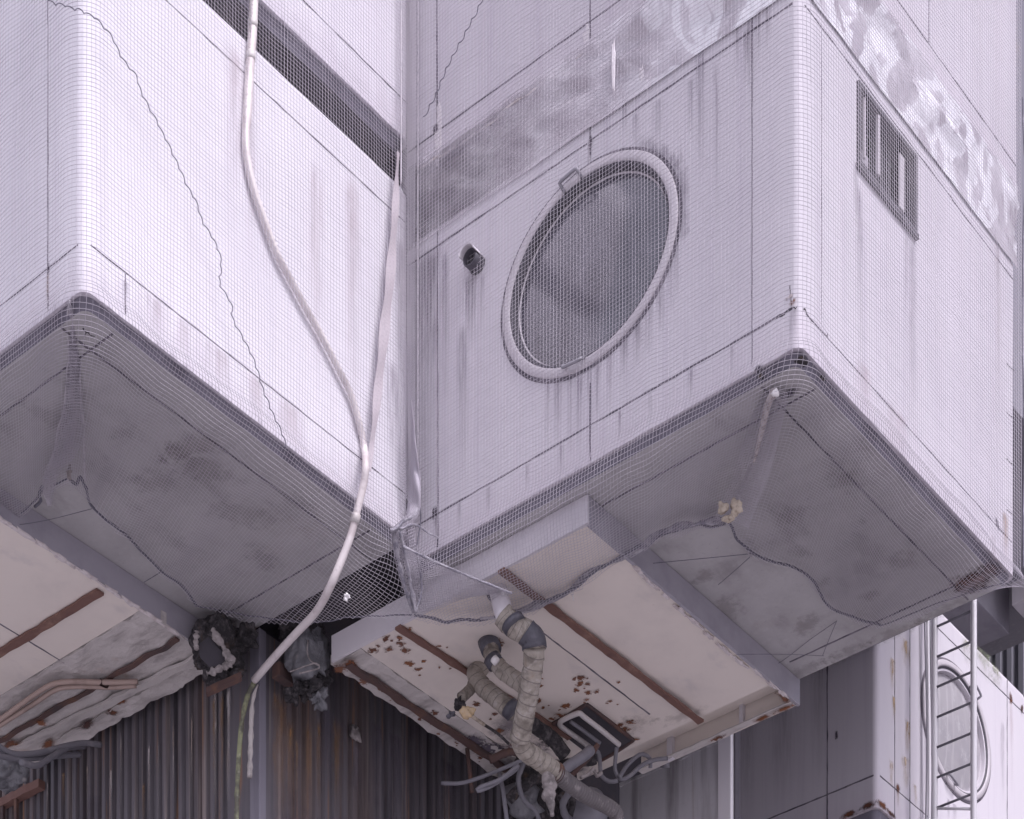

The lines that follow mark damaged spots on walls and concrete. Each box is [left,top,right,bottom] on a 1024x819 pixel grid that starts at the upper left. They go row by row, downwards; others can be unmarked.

rust [368,627,426,676]
rust [537,676,619,720]